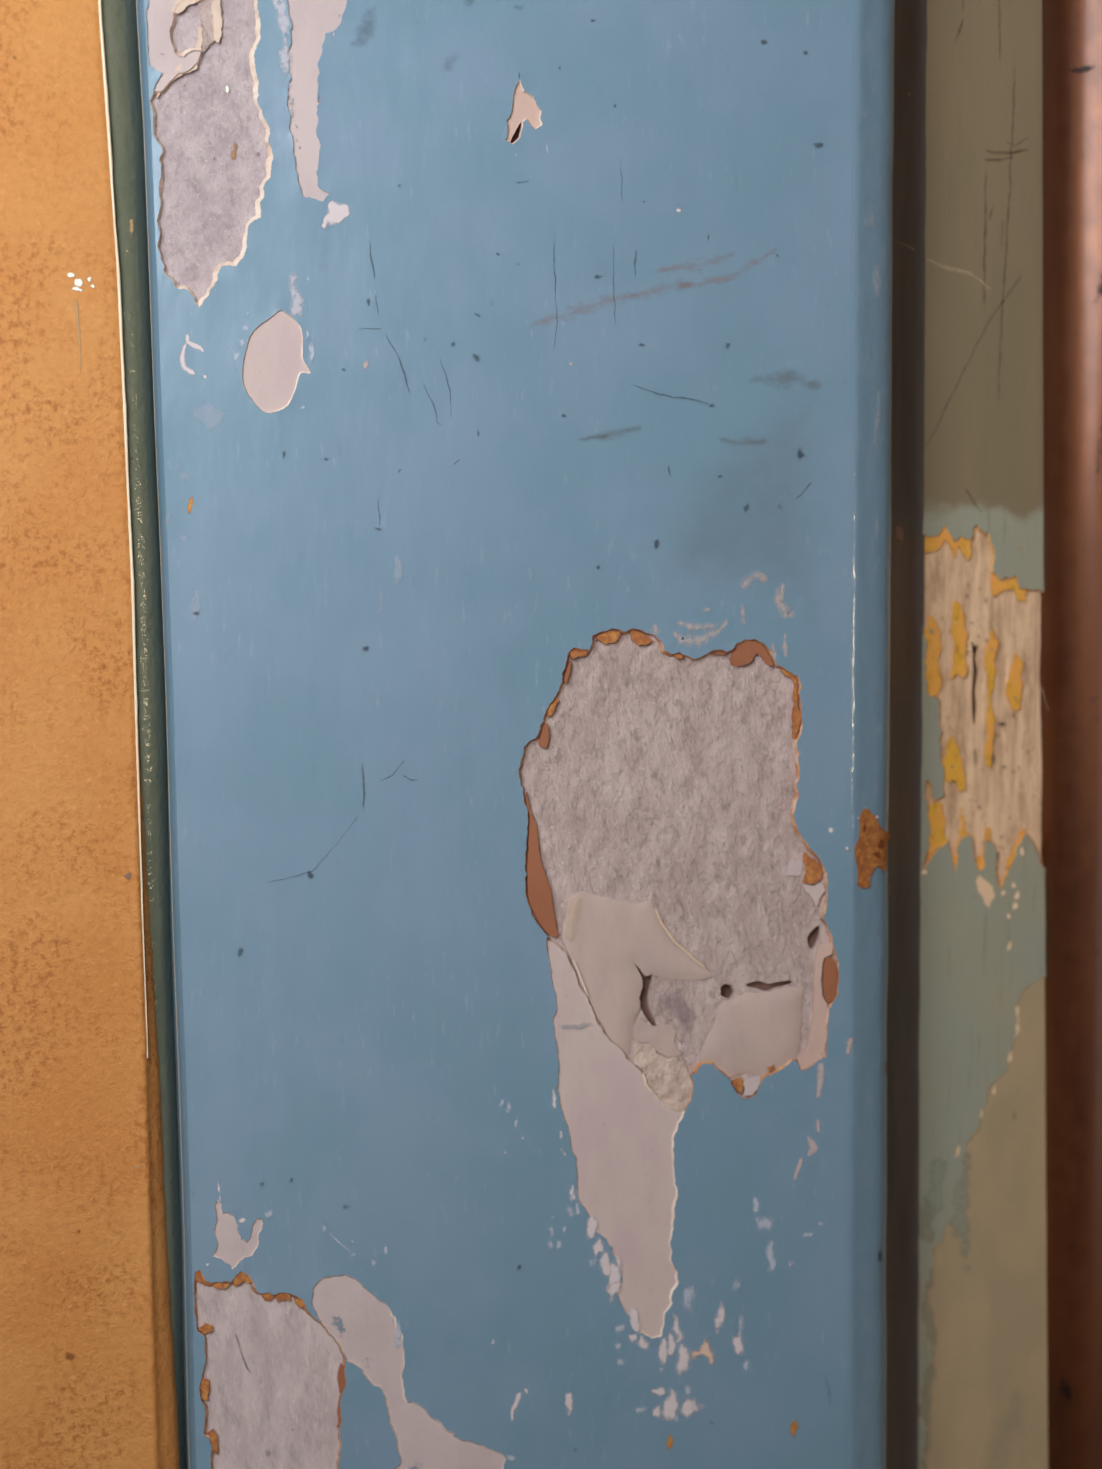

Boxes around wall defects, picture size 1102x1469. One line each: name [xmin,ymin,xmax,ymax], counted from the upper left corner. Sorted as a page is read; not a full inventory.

peeling [146,0,349,307]
peeling [506,75,542,144]
peeling [231,276,314,413]
peeling [921,525,1044,919]
peeling [519,628,839,1448]
peeling [192,1183,515,1469]
peeling [919,976,1048,1469]